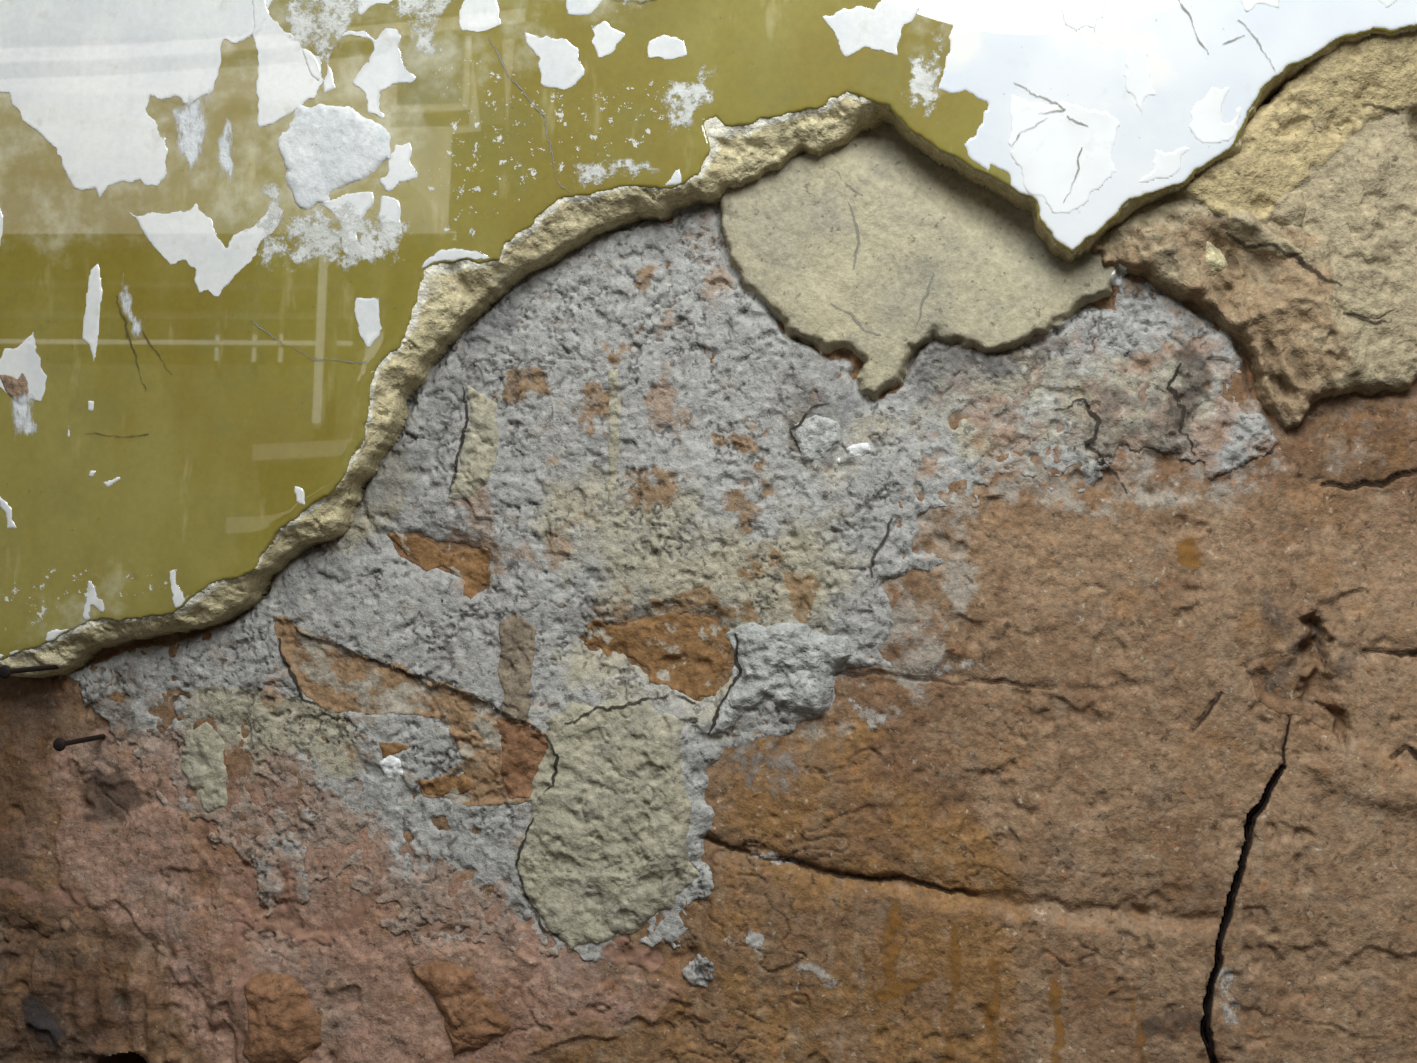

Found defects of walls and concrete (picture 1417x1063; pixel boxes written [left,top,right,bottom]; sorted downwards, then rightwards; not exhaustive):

flaking render [939,0,1417,432]
crack [1226,232,1386,324]
crack [1322,470,1417,489]
flaking render [0,92,1278,968]
crack [564,633,742,735]
crack [1365,648,1417,656]
crack [1391,747,1417,759]
crack [515,818,569,953]
crack [704,837,975,896]
crack [1201,718,1291,1063]
flaking render [681,953,714,988]